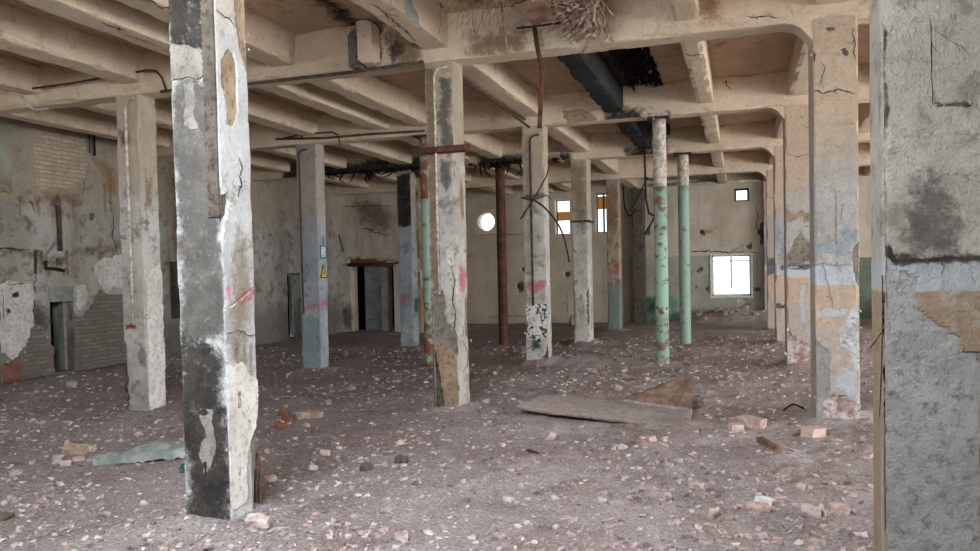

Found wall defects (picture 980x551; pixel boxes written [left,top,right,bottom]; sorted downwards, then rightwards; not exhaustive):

peeling [221,0,250,126]
crack [813,63,854,94]
crack [0,247,37,325]
peeling [786,204,810,270]
peeling [850,243,859,285]
leakage [885,170,980,266]
flaking render [2,327,55,384]
peeling [784,303,862,420]
peeling [882,255,980,551]